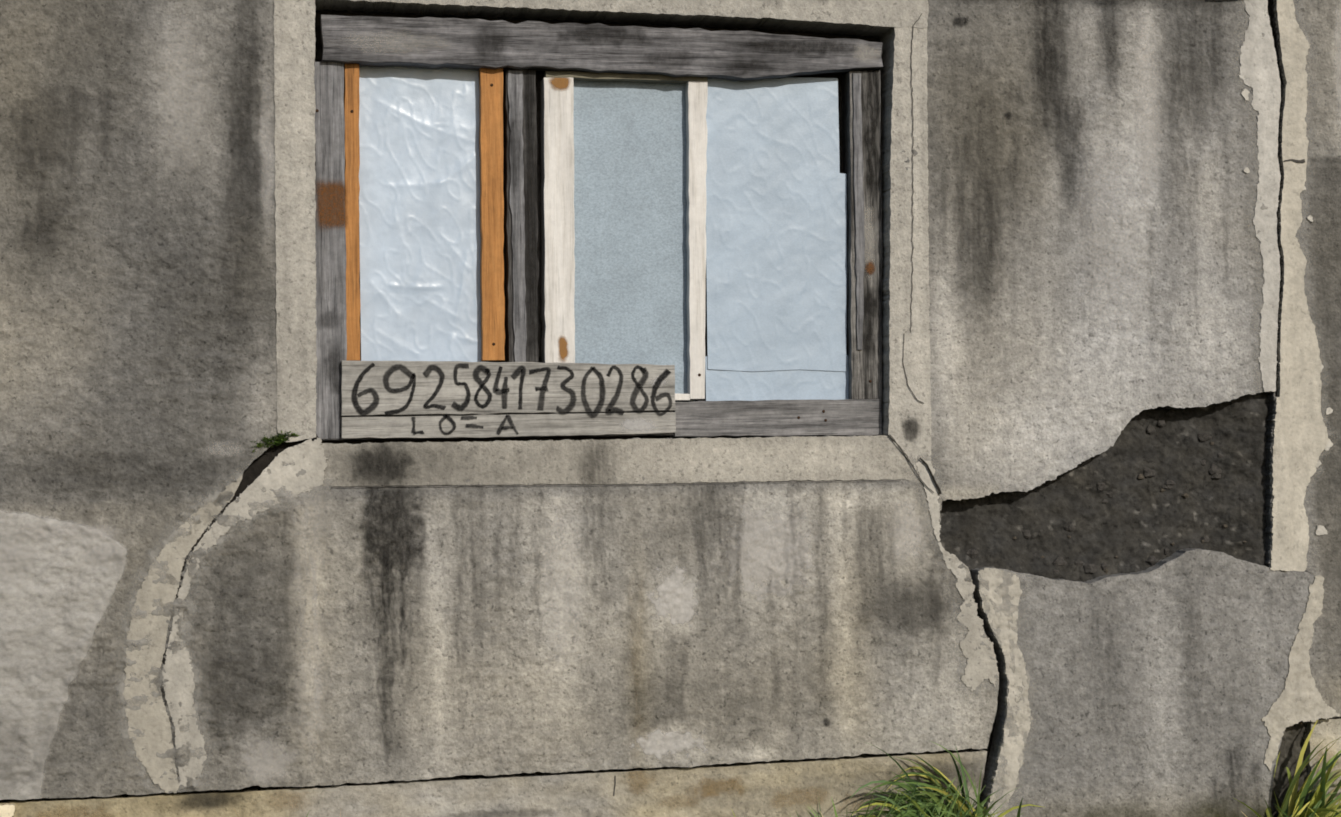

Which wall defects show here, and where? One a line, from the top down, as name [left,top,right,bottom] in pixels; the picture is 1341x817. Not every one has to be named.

crack [1267,0,1283,105]
crack [159,434,319,777]
leakage [360,448,424,625]
spalling [939,392,1270,582]
crack [970,697,998,801]